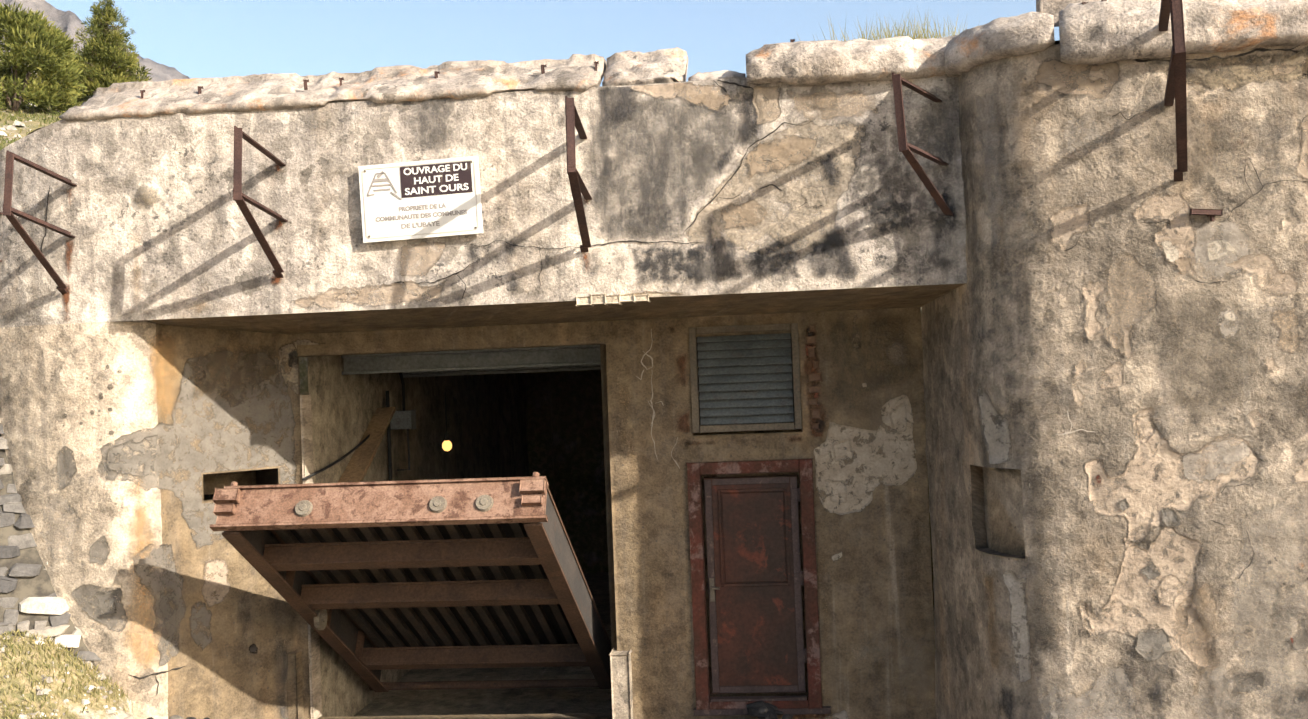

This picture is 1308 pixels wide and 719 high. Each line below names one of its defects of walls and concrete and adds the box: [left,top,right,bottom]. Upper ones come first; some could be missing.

crack [334,121,822,301]
leakage [595,86,857,285]
flaking render [1050,203,1091,251]
flaking render [1134,193,1301,371]
crack [1227,161,1308,220]
flaking render [56,446,77,488]
flaking render [98,339,319,607]
flaking render [813,394,917,515]
flaking render [72,584,127,632]
flaking render [90,536,110,565]
flaking render [132,544,186,666]
spalling [1079,407,1266,668]